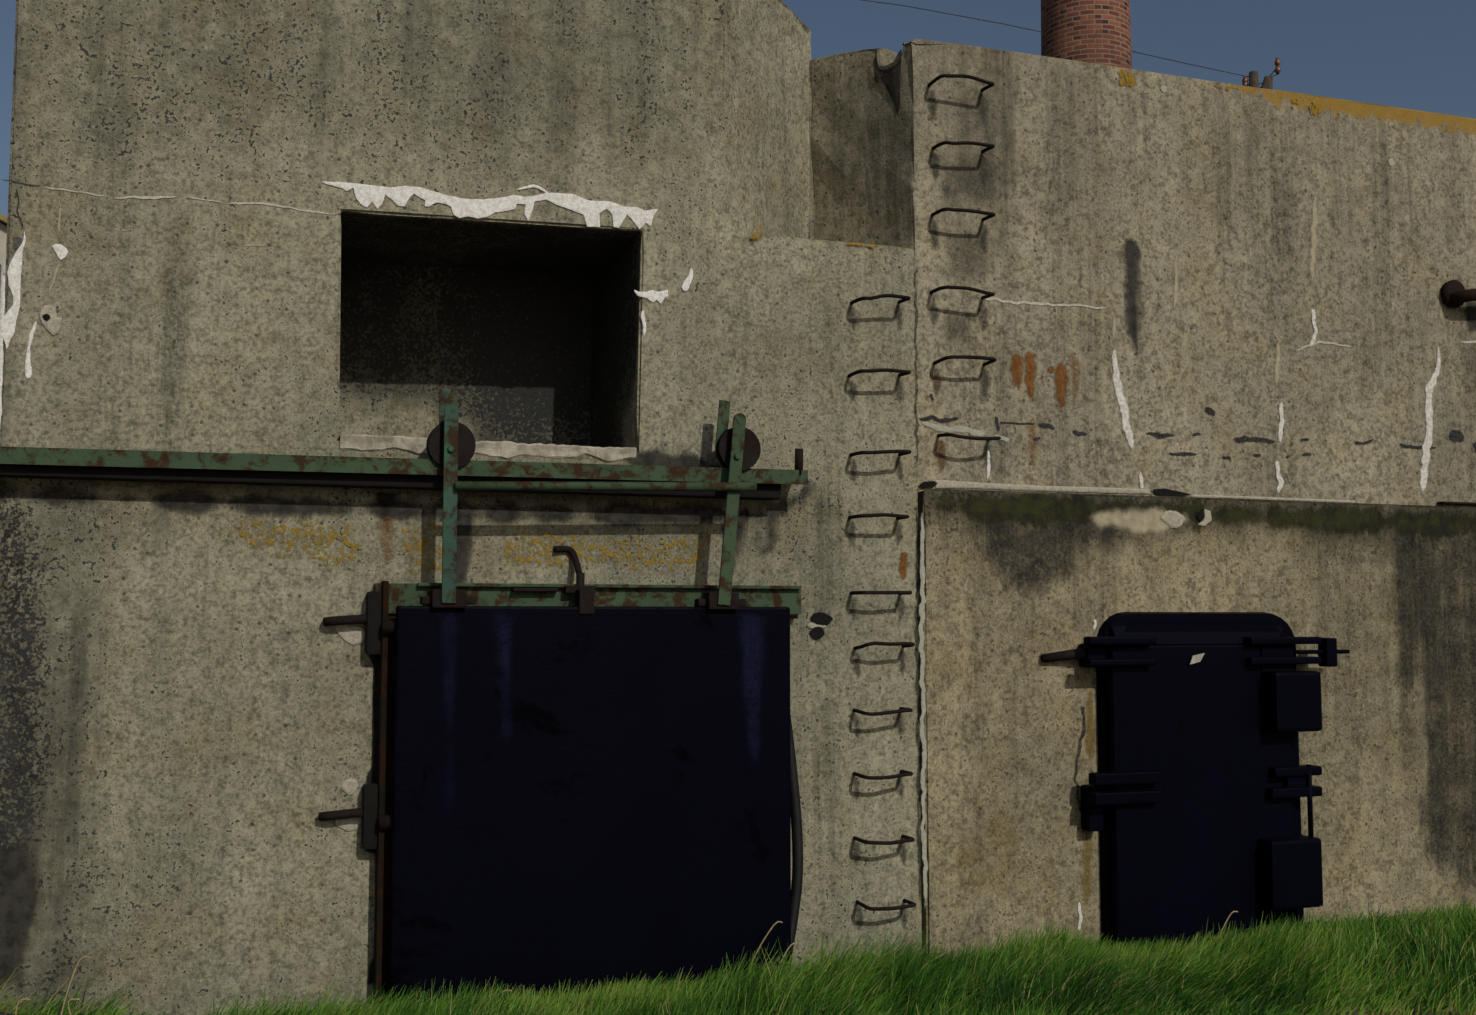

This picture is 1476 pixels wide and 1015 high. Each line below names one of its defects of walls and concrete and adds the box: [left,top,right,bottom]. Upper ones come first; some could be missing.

water stain [1309,196,1319,281]
water stain [922,422,1010,479]
corrosion [1011,352,1077,409]
water stain [1112,239,1142,448]
water stain [1274,309,1351,385]
water stain [1420,346,1441,491]
water stain [1466,302,1476,330]
water stain [153,490,352,517]
water stain [370,491,572,583]
water stain [594,485,810,549]
water stain [897,461,1476,905]
water stain [0,483,98,986]